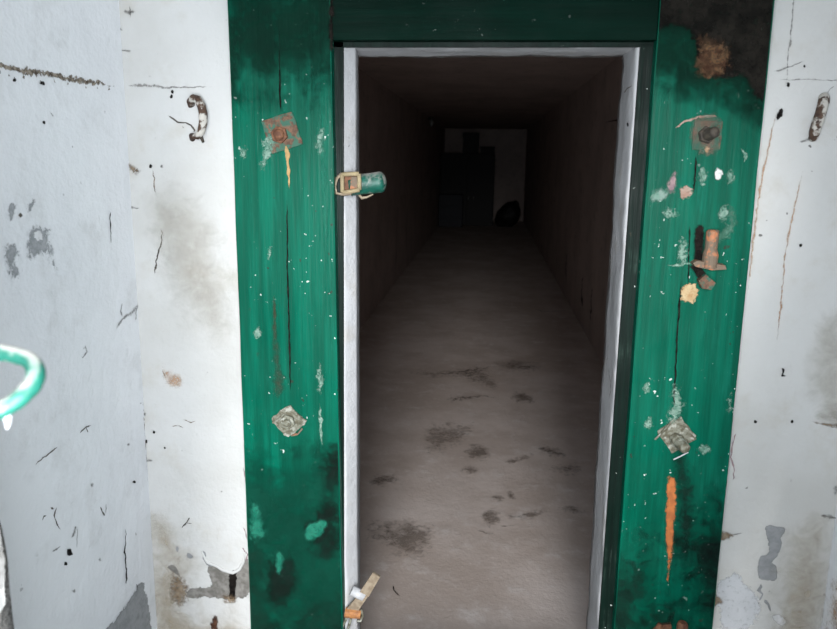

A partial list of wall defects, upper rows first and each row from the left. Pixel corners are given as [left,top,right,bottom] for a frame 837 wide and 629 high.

crack [0,62,110,90]
corrosion [695,35,730,79]
crack [777,2,832,87]
damp [9,201,34,220]
spalling [176,547,250,603]
peeling [716,525,786,629]